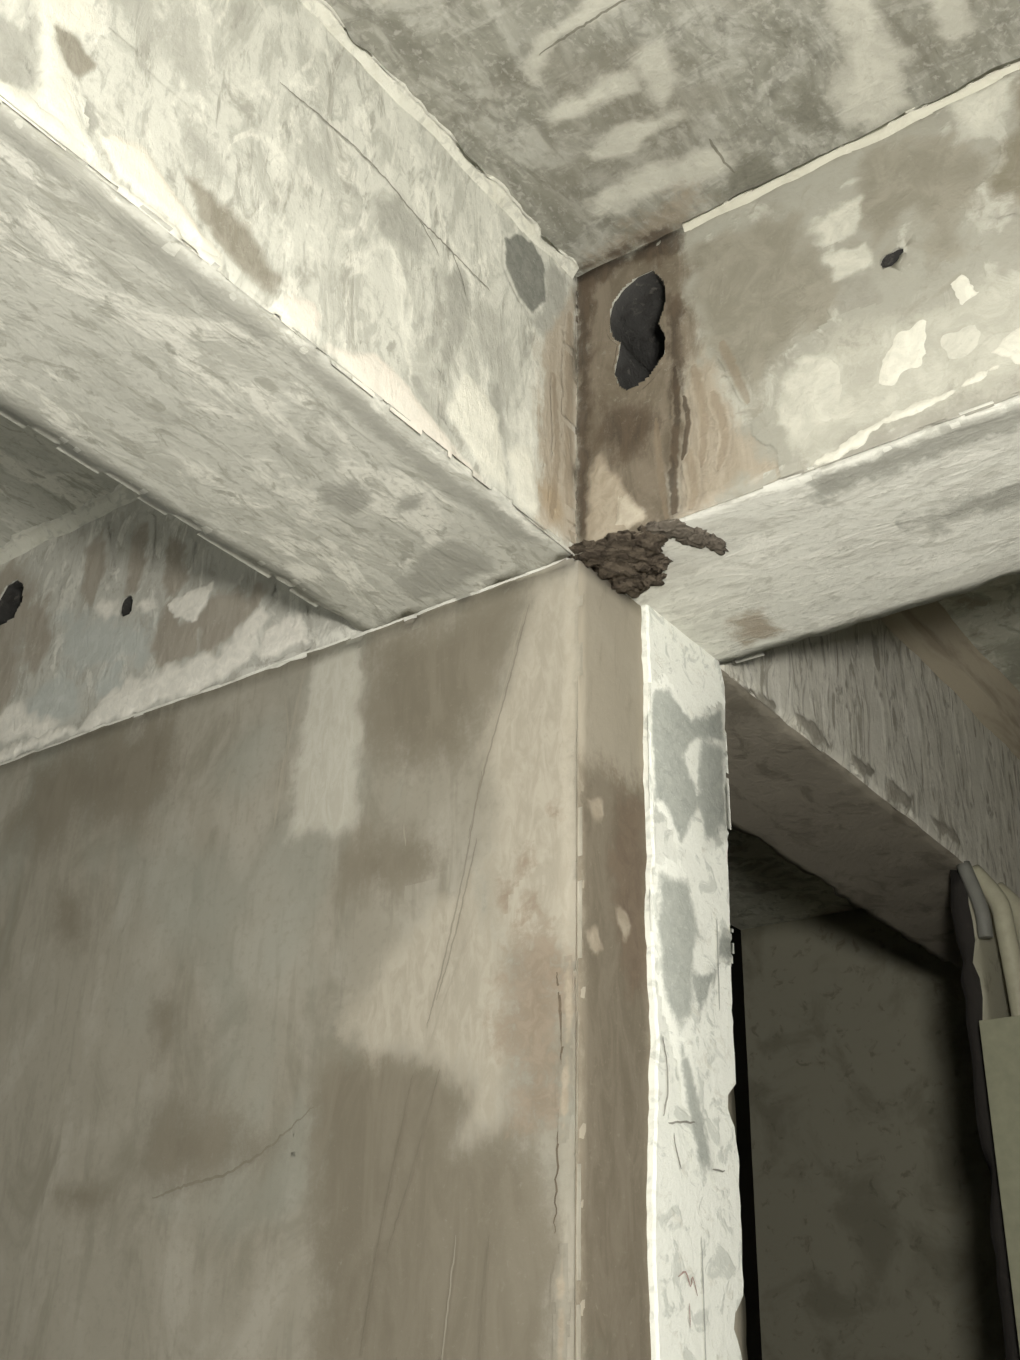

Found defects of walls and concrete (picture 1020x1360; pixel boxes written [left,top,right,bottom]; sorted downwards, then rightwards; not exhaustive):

crack [280,82,490,295]
peeling [690,69,1020,440]
peeling [814,320,1020,465]
peeling [85,576,218,628]
spalling [567,446,729,599]
damp [0,95,651,1360]